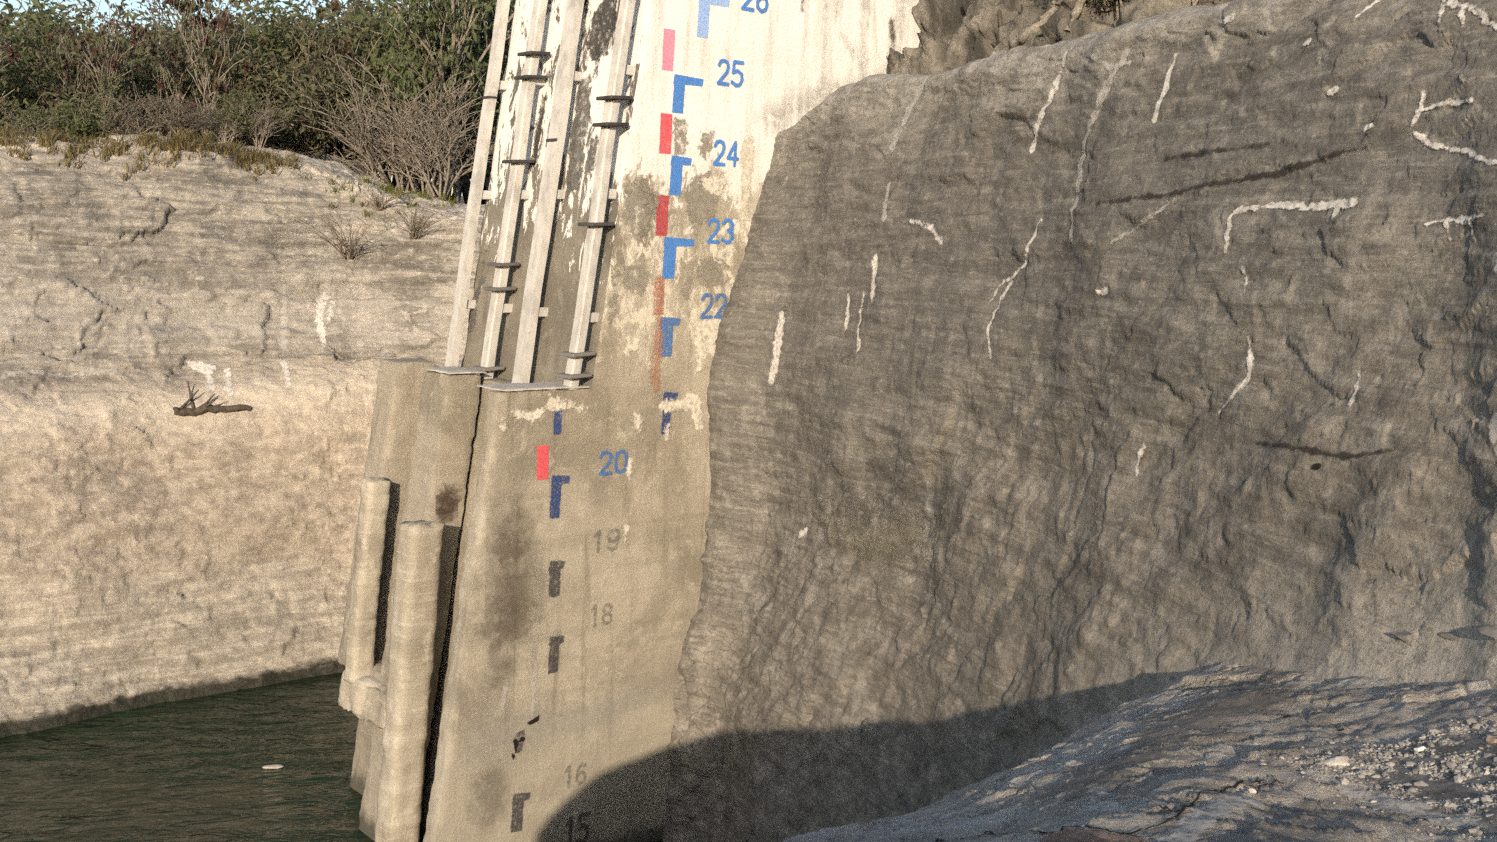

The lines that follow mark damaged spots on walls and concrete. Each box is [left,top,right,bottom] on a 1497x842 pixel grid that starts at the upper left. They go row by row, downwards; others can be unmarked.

water stain [496,535,523,643]